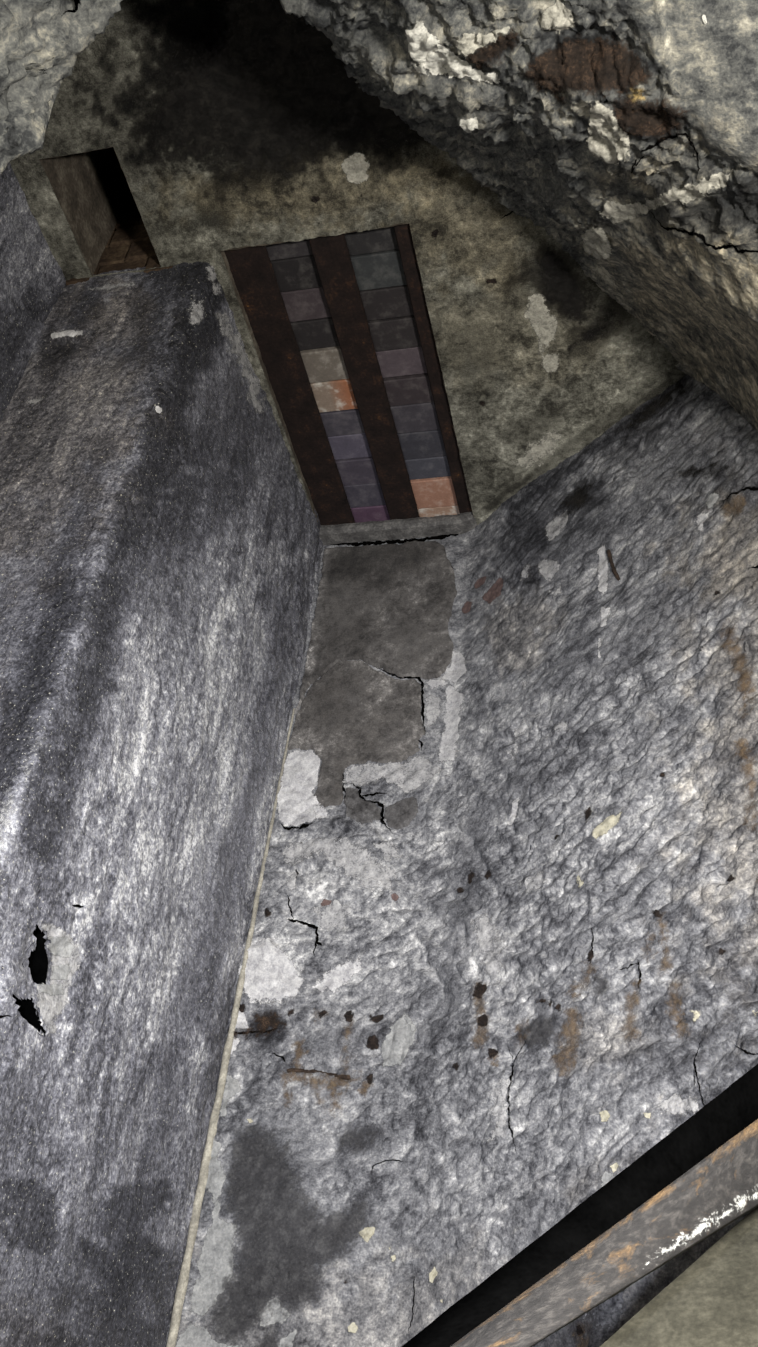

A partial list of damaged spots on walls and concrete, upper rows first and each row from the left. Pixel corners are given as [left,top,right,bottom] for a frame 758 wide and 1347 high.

spalling [405,21,510,84]
corrosion [467,31,518,72]
spalling [538,0,575,34]
corrosion [525,37,687,136]
spalling [586,101,630,165]
crack [374,666,426,751]
spalling [277,750,402,893]
spalling [314,900,351,931]
spalling [13,924,80,1037]
water stain [213,1126,365,1347]